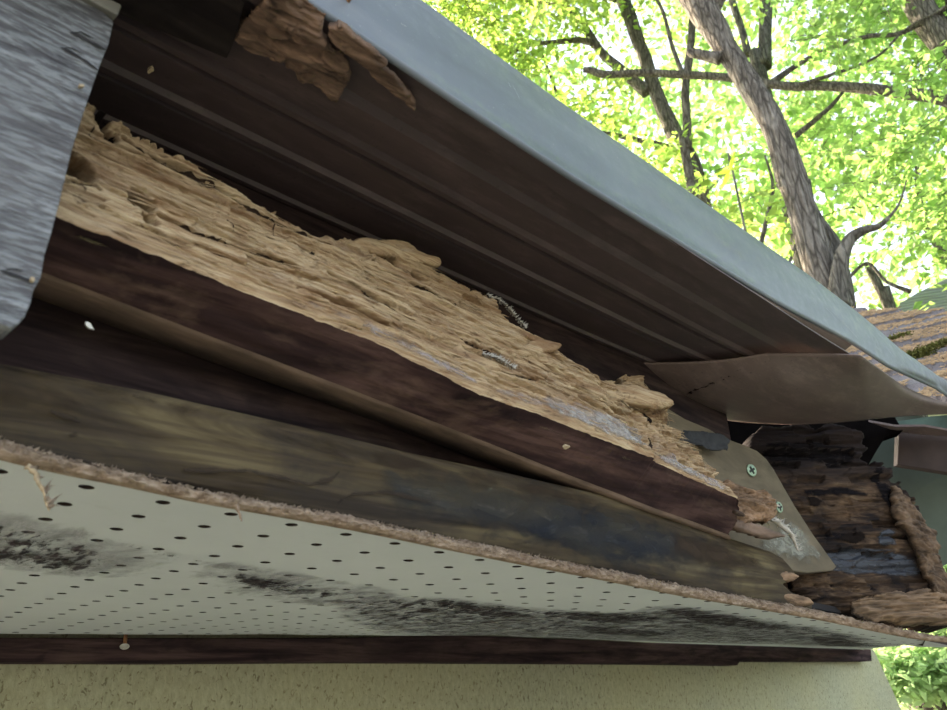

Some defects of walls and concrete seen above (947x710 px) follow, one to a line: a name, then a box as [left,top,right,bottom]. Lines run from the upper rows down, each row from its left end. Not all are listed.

spalling [94,110,115,144]
peeling [538,398,645,444]
peeling [659,453,725,489]
damp [804,487,867,496]
damp [0,524,115,573]
damp [764,524,921,576]
spalling [889,486,947,604]
damp [213,564,883,648]
peeling [781,571,813,607]